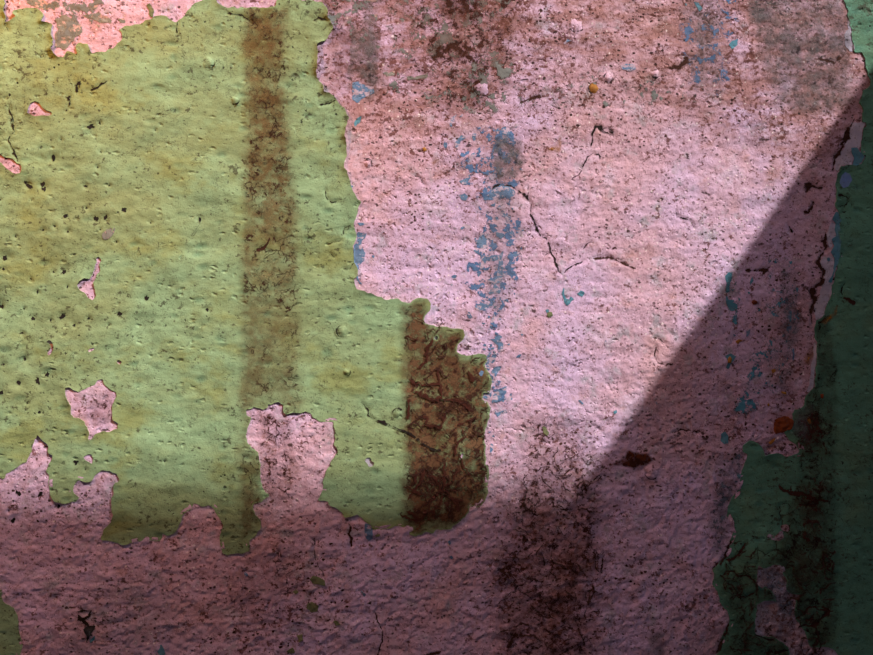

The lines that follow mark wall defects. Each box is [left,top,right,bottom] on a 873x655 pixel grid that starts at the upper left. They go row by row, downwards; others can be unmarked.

peeling [4,0,202,57]
peeling [216,0,276,8]
leakage [411,0,520,111]
leakage [754,0,848,111]
crack [572,125,614,179]
leakage [244,8,298,497]
crack [492,184,636,273]
peeling [813,212,842,320]
peeling [65,379,118,440]
crack [361,402,441,451]
rust [614,450,652,468]
rust [769,416,794,444]